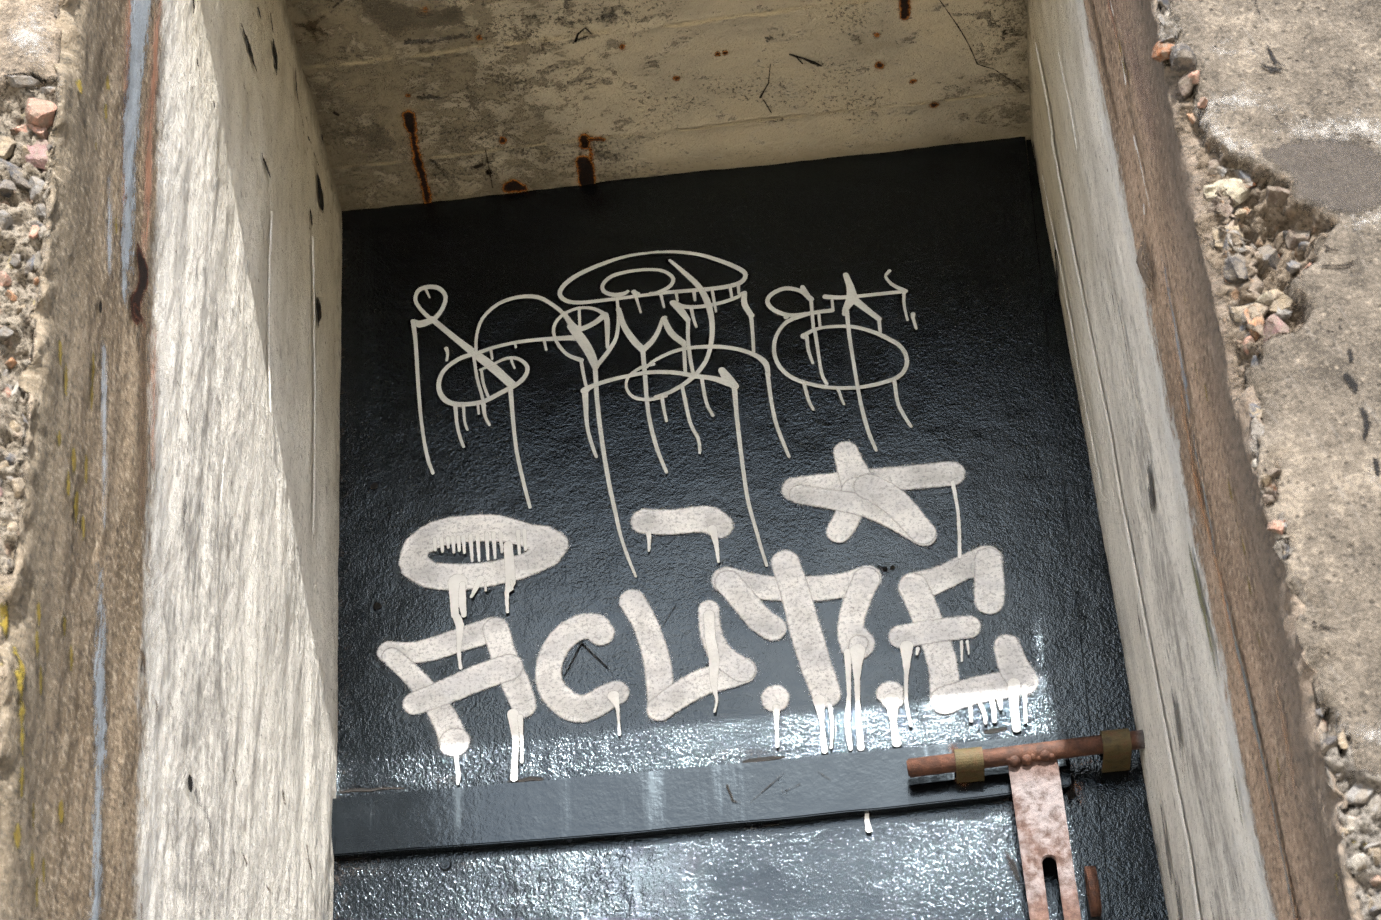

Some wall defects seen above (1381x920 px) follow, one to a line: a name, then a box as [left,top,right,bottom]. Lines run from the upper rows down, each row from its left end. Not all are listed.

rust [898,0,912,21]
rust [400,93,432,204]
rust [575,133,606,186]